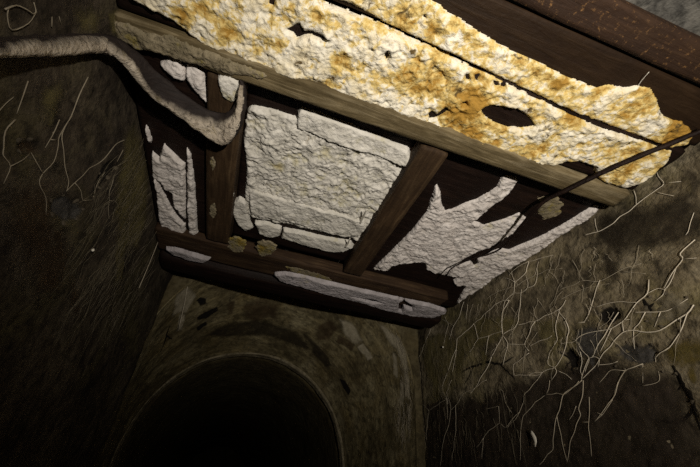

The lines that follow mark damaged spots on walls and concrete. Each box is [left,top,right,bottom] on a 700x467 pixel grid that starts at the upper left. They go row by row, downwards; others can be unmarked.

damp [537,195,564,220]
damp [227,236,277,257]
crack [642,299,654,312]
crack [462,357,515,384]
crack [671,365,700,429]